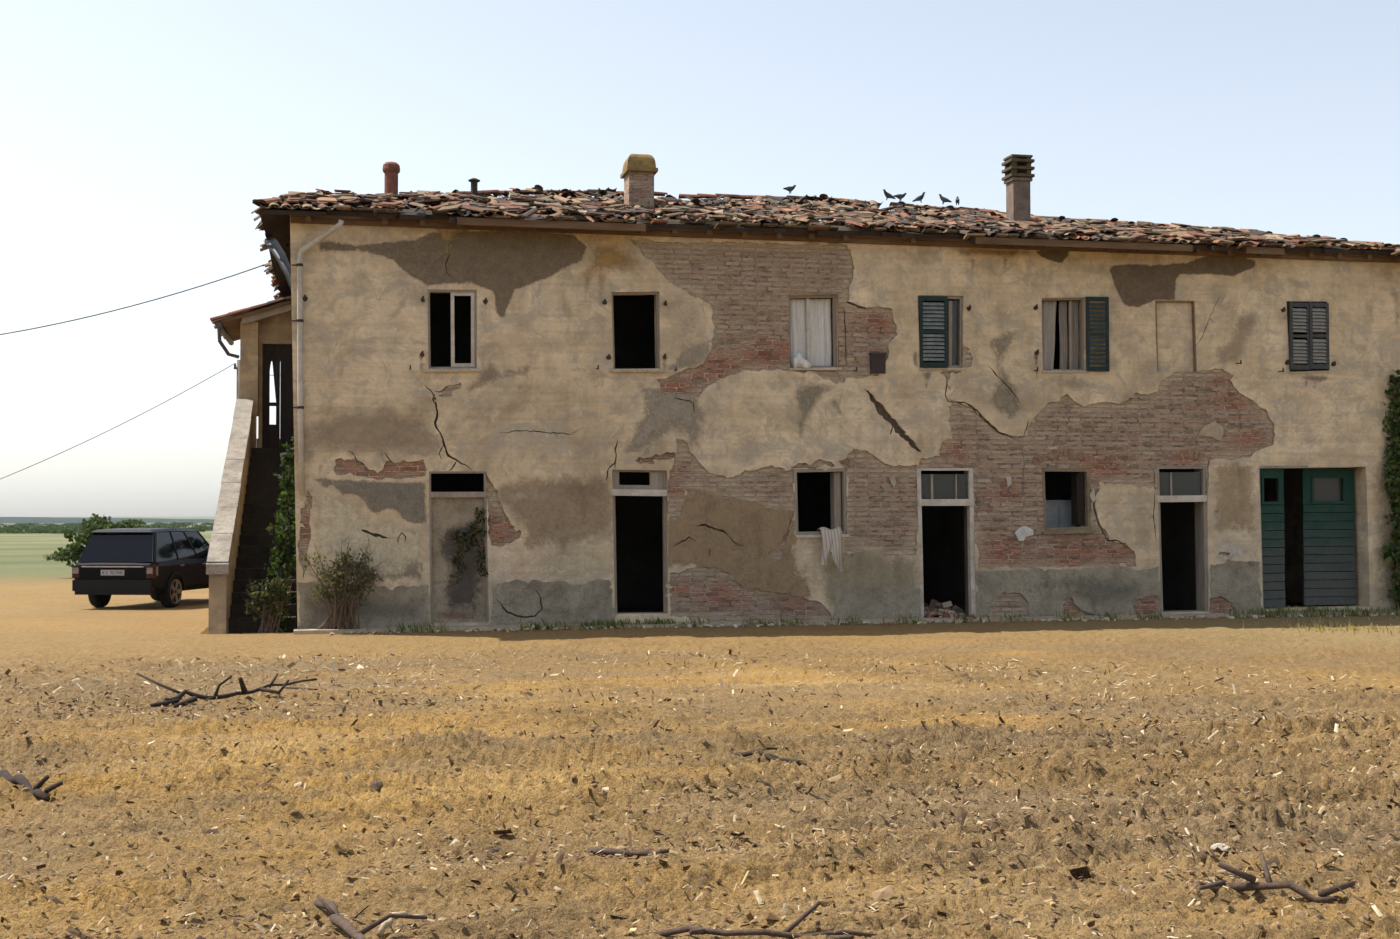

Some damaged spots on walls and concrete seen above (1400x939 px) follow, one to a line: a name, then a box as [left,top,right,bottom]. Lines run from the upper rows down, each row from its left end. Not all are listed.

crack [425,385,472,471]
flaking render [630,239,1275,570]
flaking render [297,455,428,579]
flaking render [486,474,521,547]